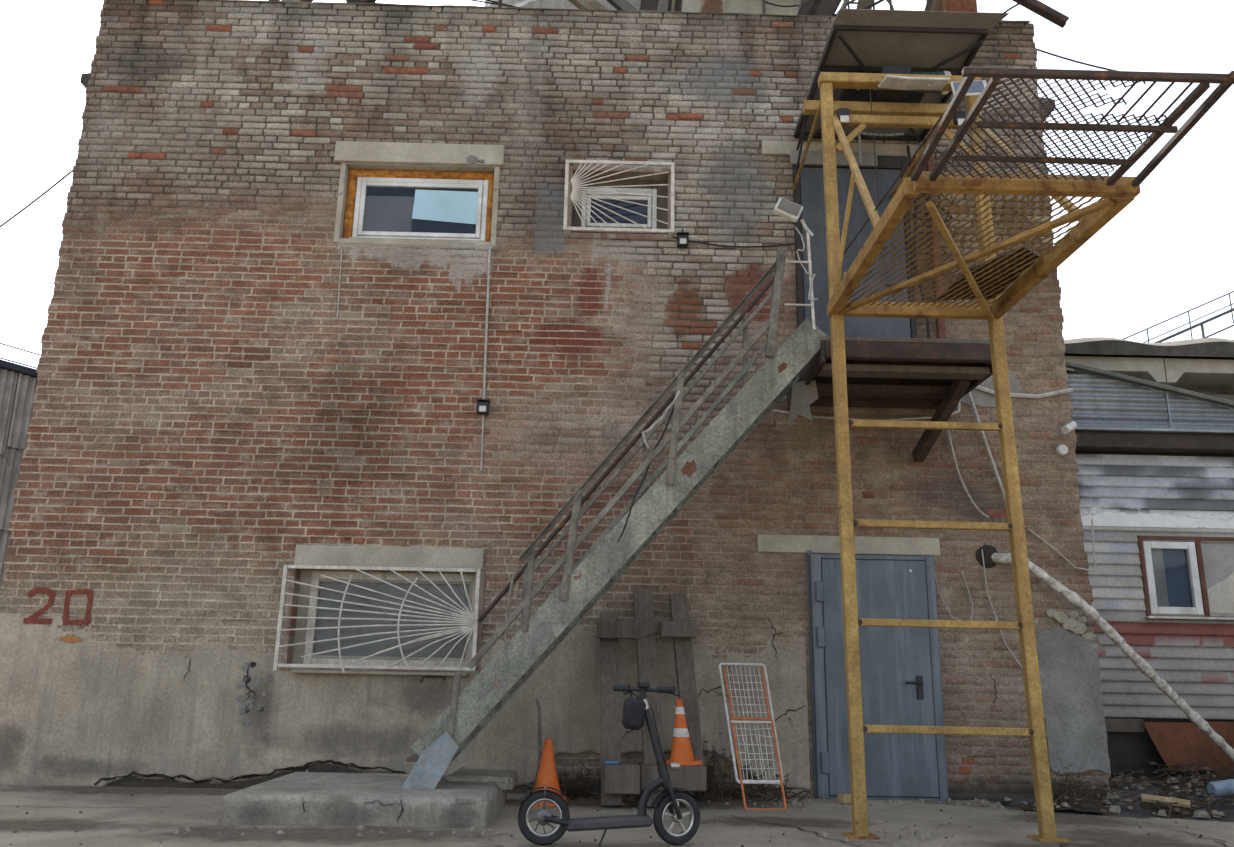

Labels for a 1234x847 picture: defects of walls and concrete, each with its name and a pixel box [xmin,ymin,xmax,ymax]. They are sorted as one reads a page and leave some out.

rust [946,0,976,12]
peeling [1081,507,1234,529]